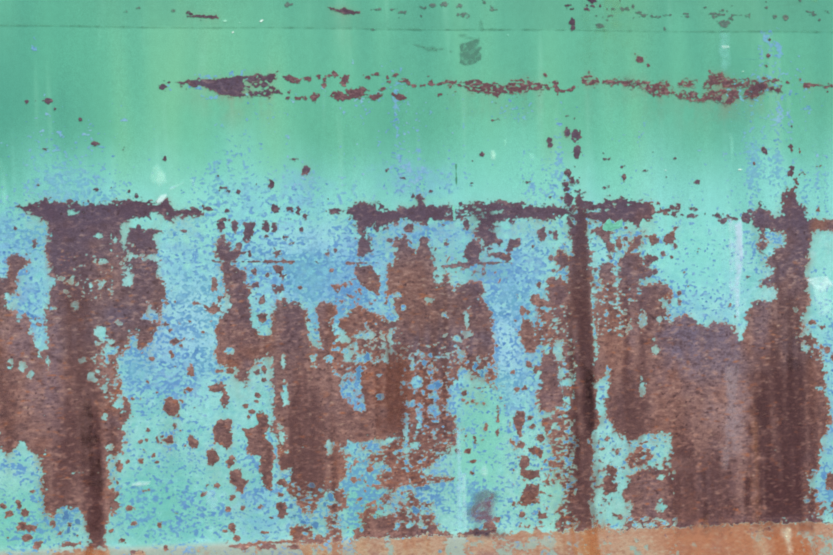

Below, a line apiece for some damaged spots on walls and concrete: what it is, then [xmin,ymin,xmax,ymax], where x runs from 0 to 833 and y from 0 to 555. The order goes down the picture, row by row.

peeling [0,449,88,555]
peeling [0,113,135,344]
peeling [95,61,676,555]
corrosion [0,115,833,555]
corrosion [158,53,833,107]
corrosion [584,0,690,31]
peeling [586,27,833,335]
corrosion [703,5,750,28]
peeling [803,261,833,522]